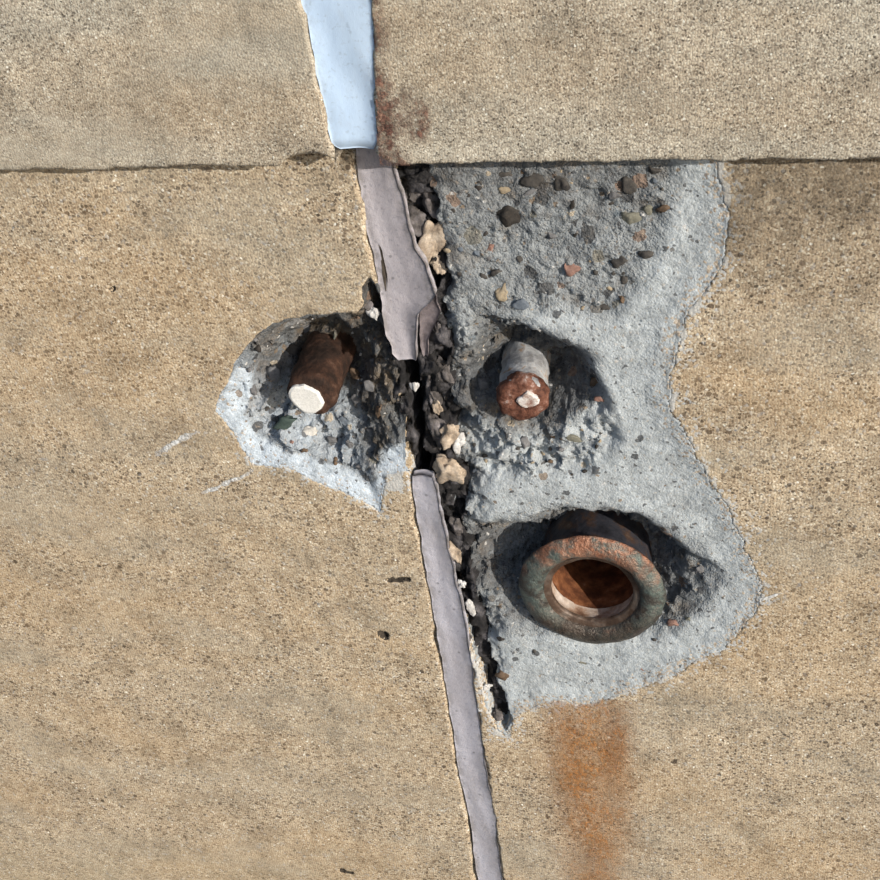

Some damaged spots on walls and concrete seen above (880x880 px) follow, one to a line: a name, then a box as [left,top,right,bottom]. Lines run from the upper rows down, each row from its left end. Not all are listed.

spalling [216,278,410,512]
crack [387,163,509,721]
spalling [429,159,778,736]
rust [561,706,623,858]